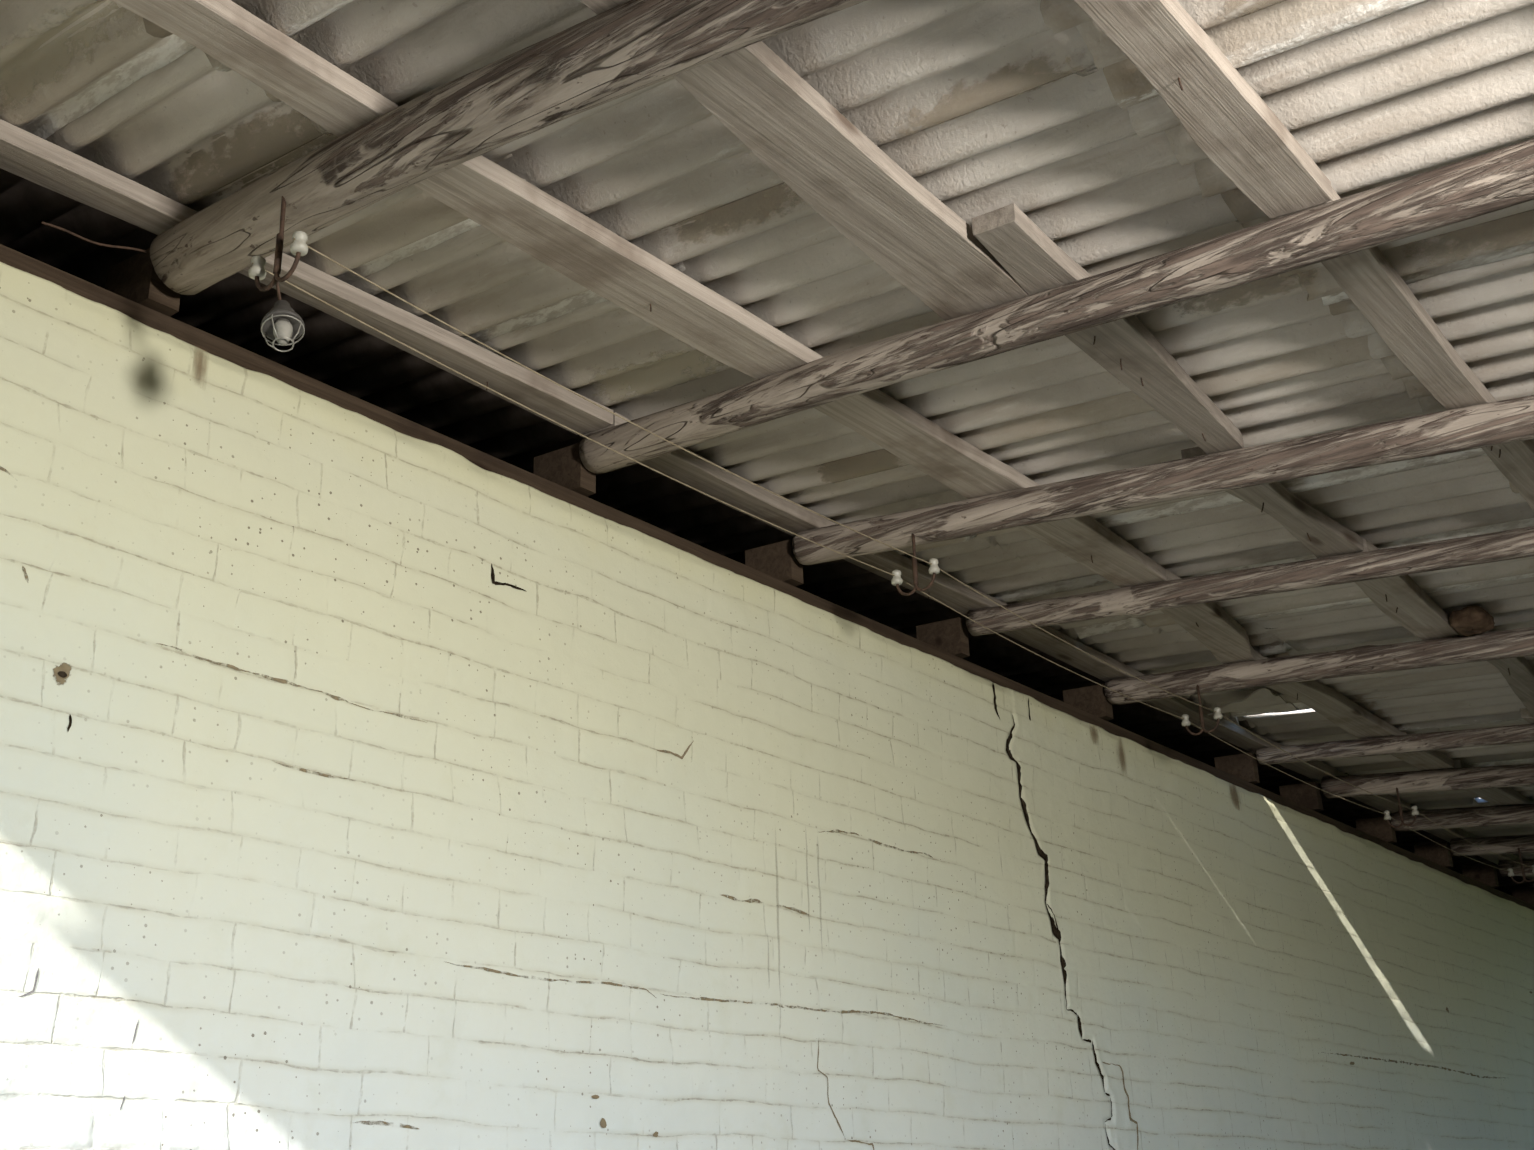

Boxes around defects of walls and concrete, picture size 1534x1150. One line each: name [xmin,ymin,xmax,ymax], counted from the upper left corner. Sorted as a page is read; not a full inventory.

crack [722,894,809,915]
crack [992,684,1139,1150]
crack [362,1121,419,1129]
crack [447,962,939,1150]